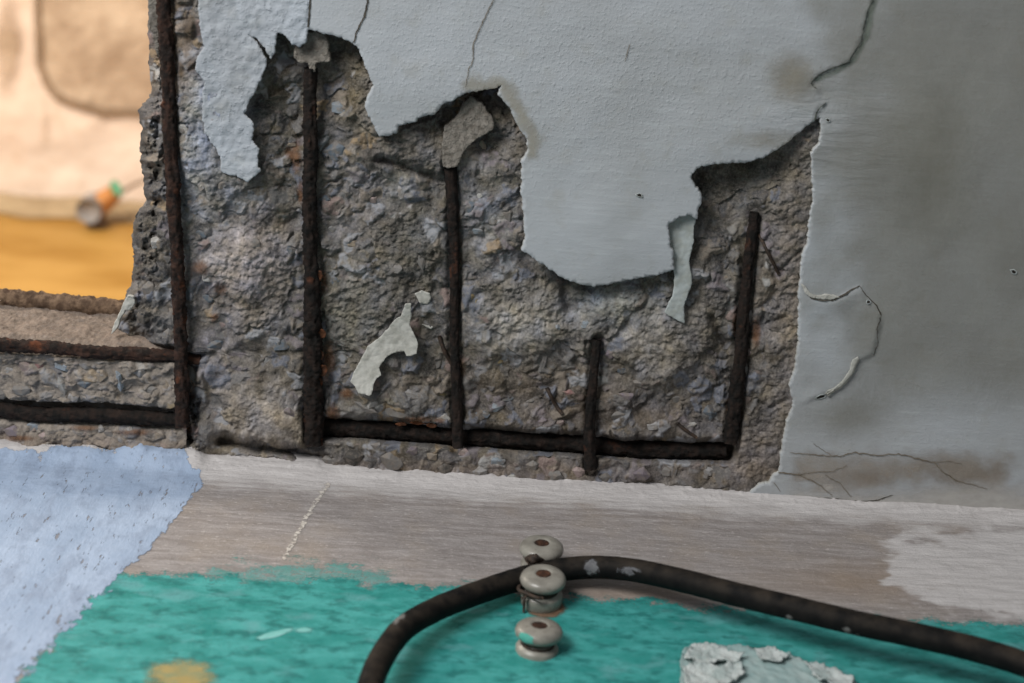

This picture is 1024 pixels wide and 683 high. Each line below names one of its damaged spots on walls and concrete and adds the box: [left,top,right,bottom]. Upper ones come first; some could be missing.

crack [353,0,369,43]
crack [465,0,494,87]
crack [811,0,873,120]
spalling [0,0,840,492]
crack [810,286,881,354]
crack [774,446,986,502]
leakage [840,467,1024,510]